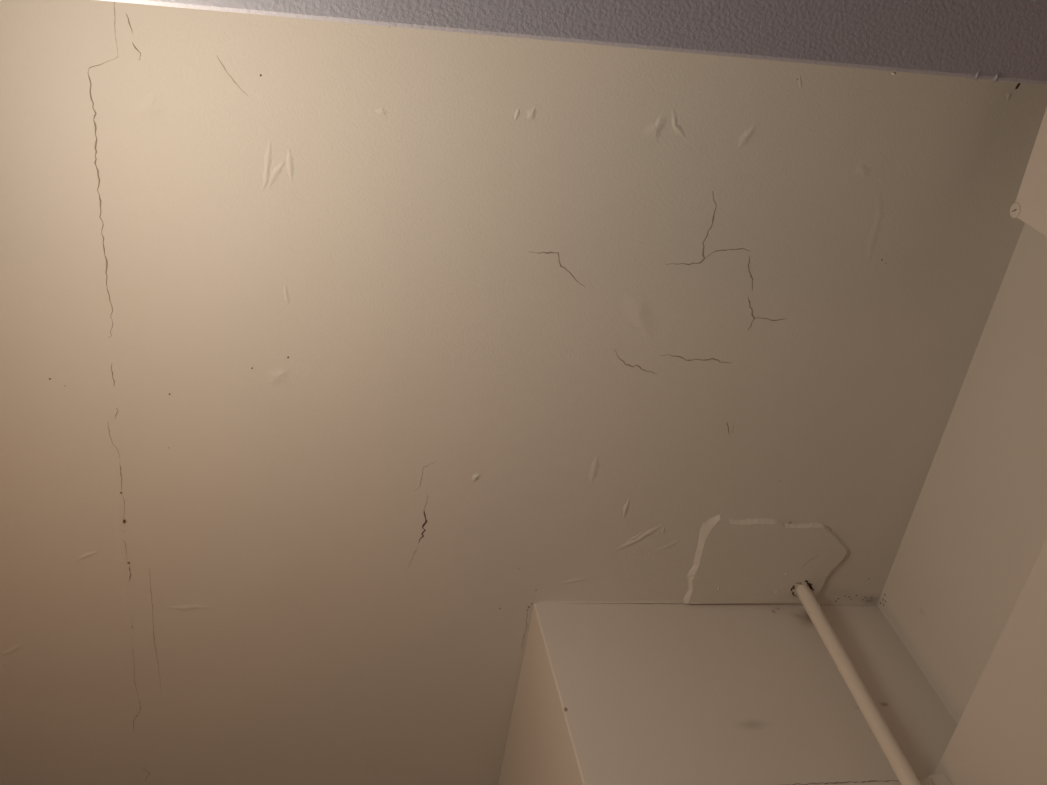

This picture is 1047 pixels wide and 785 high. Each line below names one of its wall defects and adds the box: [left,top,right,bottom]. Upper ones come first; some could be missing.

crack [88,6,141,338]
crack [534,252,582,285]
crack [666,191,787,330]
crack [616,353,728,374]
crack [108,365,131,580]
crack [408,464,430,567]
spalling [787,577,815,598]